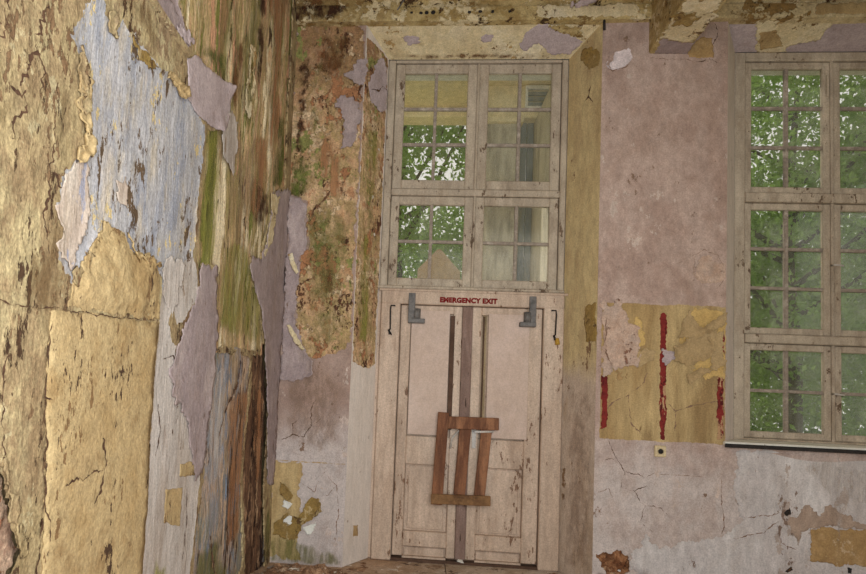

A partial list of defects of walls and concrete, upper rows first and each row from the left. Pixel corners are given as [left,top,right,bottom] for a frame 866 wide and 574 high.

leakage [296,0,345,21]
peeling [654,0,723,58]
peeling [755,0,866,53]
peeling [55,0,388,574]
peeling [584,299,728,445]
spalling [0,455,30,574]
peeling [596,449,866,574]